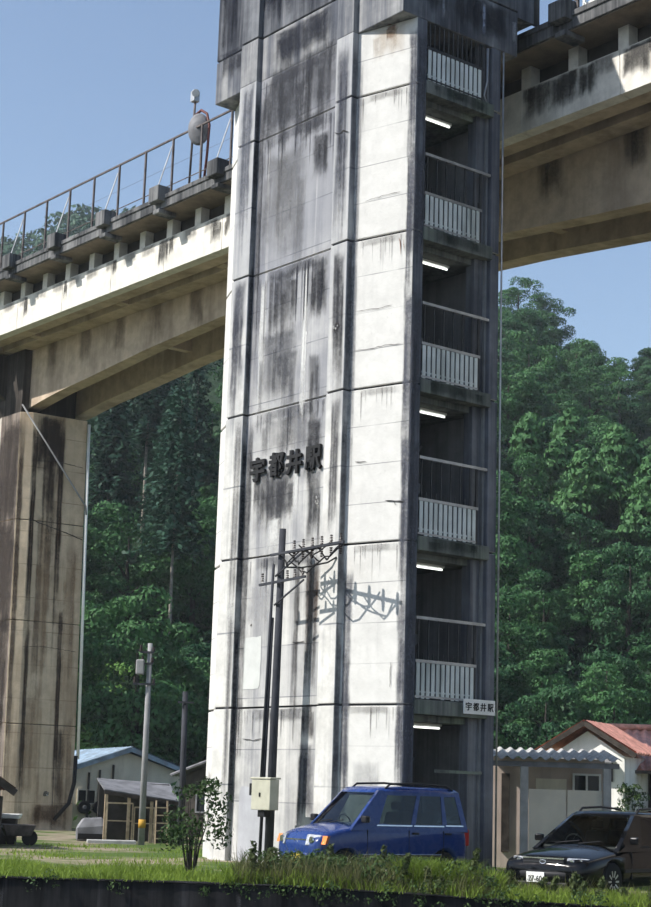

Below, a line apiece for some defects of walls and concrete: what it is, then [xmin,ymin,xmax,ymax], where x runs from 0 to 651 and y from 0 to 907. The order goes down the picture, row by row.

damp [408,34,427,133]
damp [525,59,612,113]
damp [625,39,650,72]
damp [159,238,173,260]
damp [232,9,361,405]
damp [406,154,425,256]
damp [401,297,421,430]
damp [399,440,419,580]
damp [0,418,65,792]
damp [228,438,318,813]
damp [330,406,352,789]
damp [395,614,414,787]